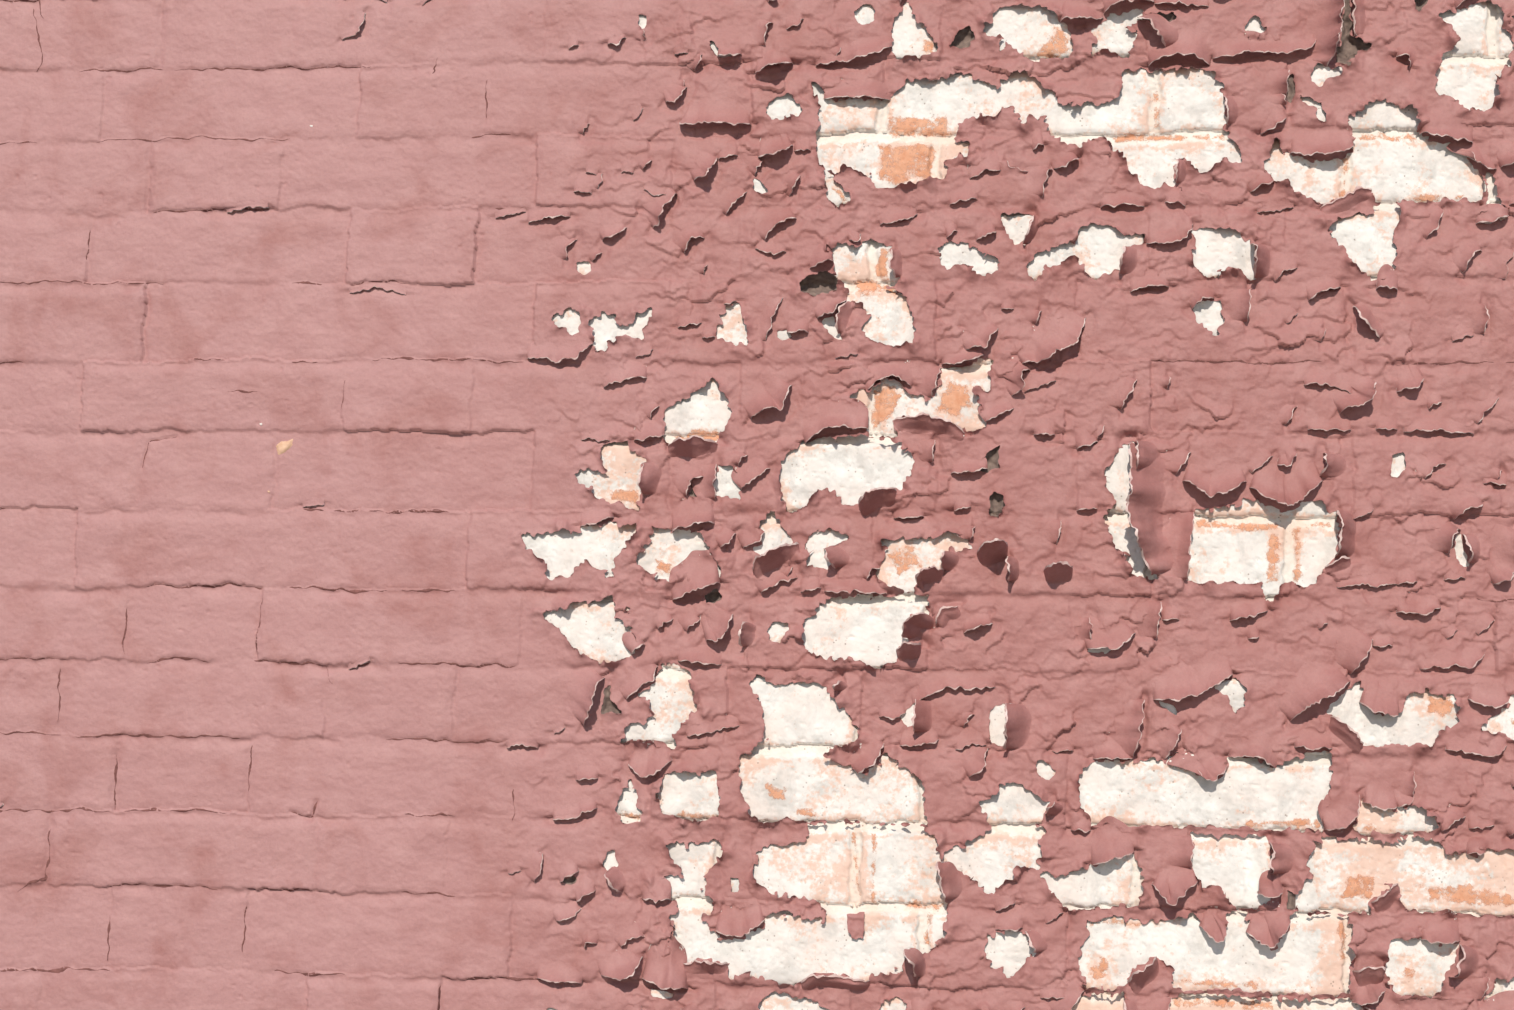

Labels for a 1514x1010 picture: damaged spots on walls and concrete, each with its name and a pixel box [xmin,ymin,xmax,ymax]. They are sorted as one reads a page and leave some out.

crack [2,0,44,71]
crack [81,65,370,73]
crack [154,206,269,214]
peeling [495,173,603,224]
crack [292,357,518,409]
peeling [521,0,1514,1010]
crack [122,582,514,684]
crack [387,737,502,745]
peeling [505,728,538,748]
crack [0,657,252,891]
crack [1,883,322,973]
crack [437,977,542,1010]